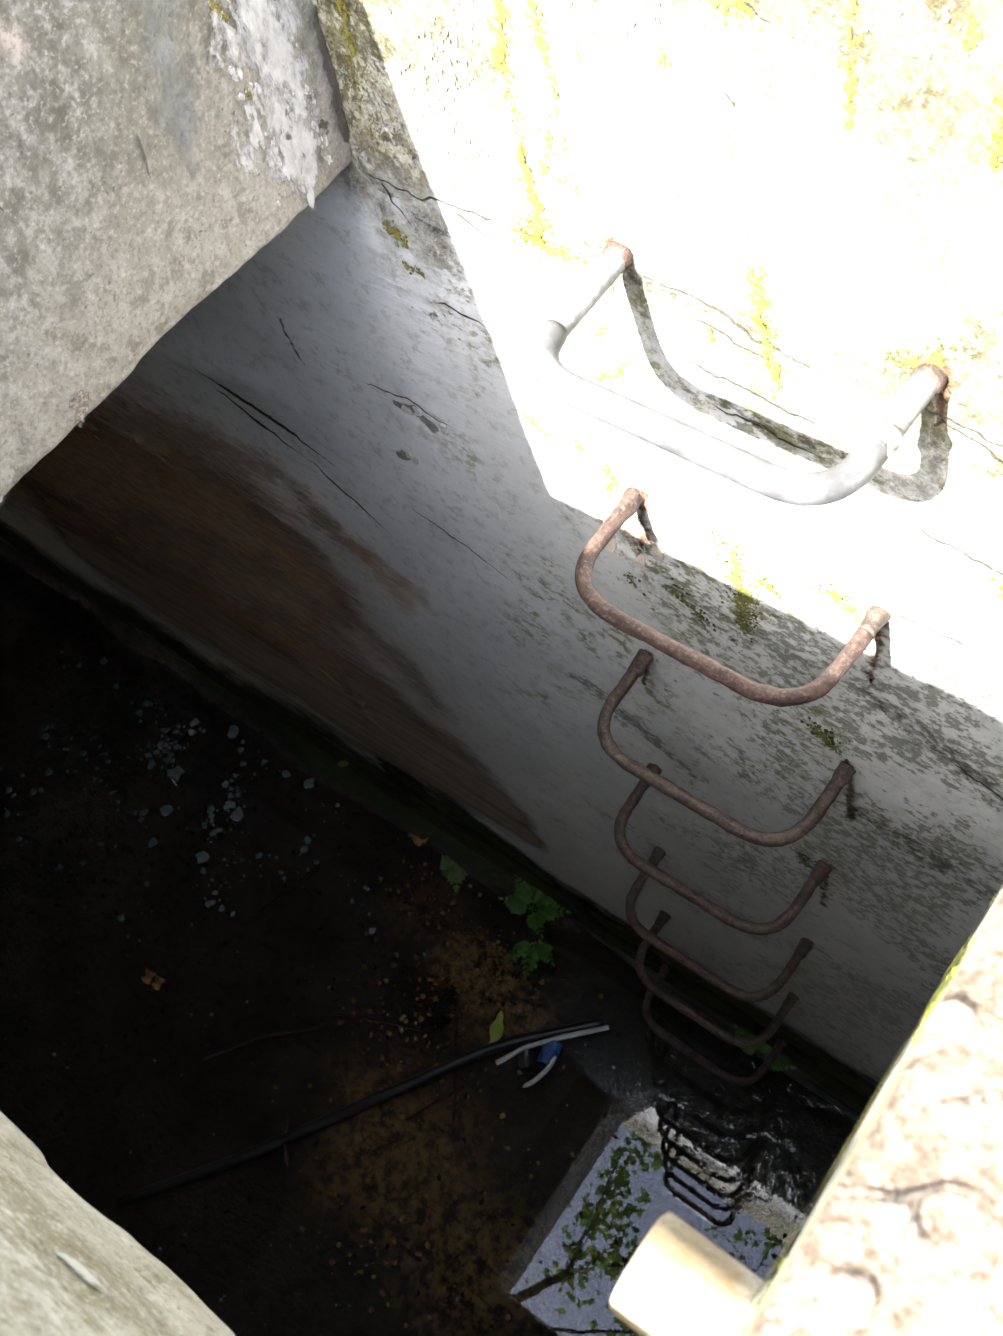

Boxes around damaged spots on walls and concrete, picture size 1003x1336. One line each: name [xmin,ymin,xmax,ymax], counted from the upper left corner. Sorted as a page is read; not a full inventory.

damp [226,0,350,207]
crack [366,383,451,427]
rust [934,364,958,427]
crack [195,369,392,536]
crack [413,509,508,579]
rust [615,487,650,554]
rust [628,649,658,686]
rust [859,605,891,681]
rust [831,759,857,820]
rust [808,857,835,907]
rust [794,937,814,959]